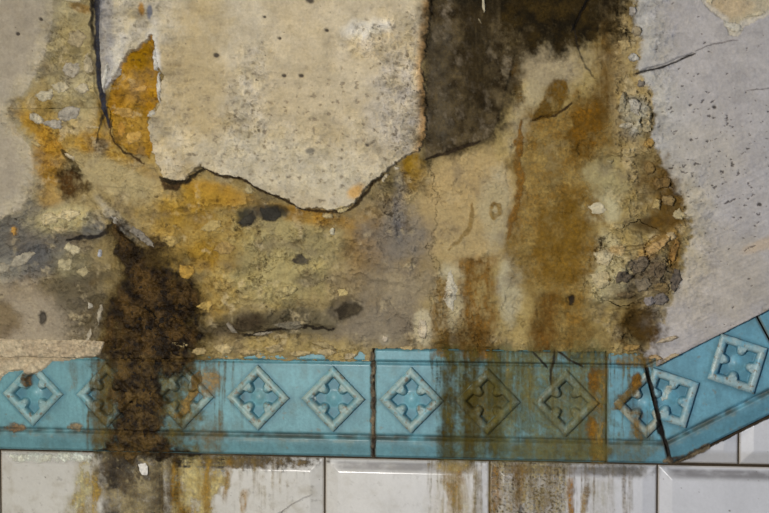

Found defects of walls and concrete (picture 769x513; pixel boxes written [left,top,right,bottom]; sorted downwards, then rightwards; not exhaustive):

crack [88,0,144,164]
crack [159,167,389,213]
flaking render [0,0,694,364]
crack [425,141,480,160]
damp [419,0,630,162]
damp [490,68,612,462]
peeling [701,0,769,37]
damp [87,220,226,513]
corrosion [434,259,594,513]
damp [614,311,661,382]
corrosion [614,355,663,410]
corrosion [165,455,329,513]